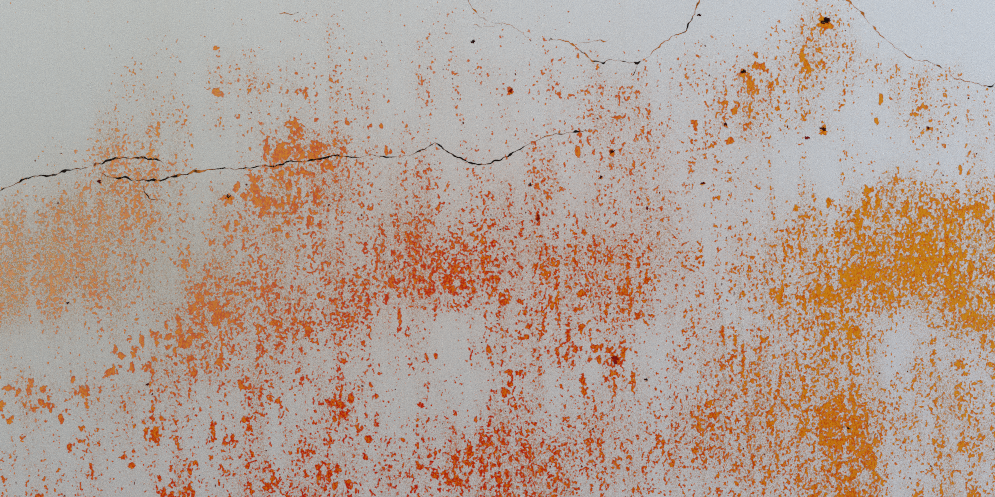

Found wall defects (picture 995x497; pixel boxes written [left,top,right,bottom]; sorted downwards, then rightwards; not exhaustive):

crack [550,0,700,77]
crack [848,0,994,87]
peeling [91,146,197,197]
peeling [201,124,381,259]
crack [0,130,586,204]
peeling [0,282,235,464]